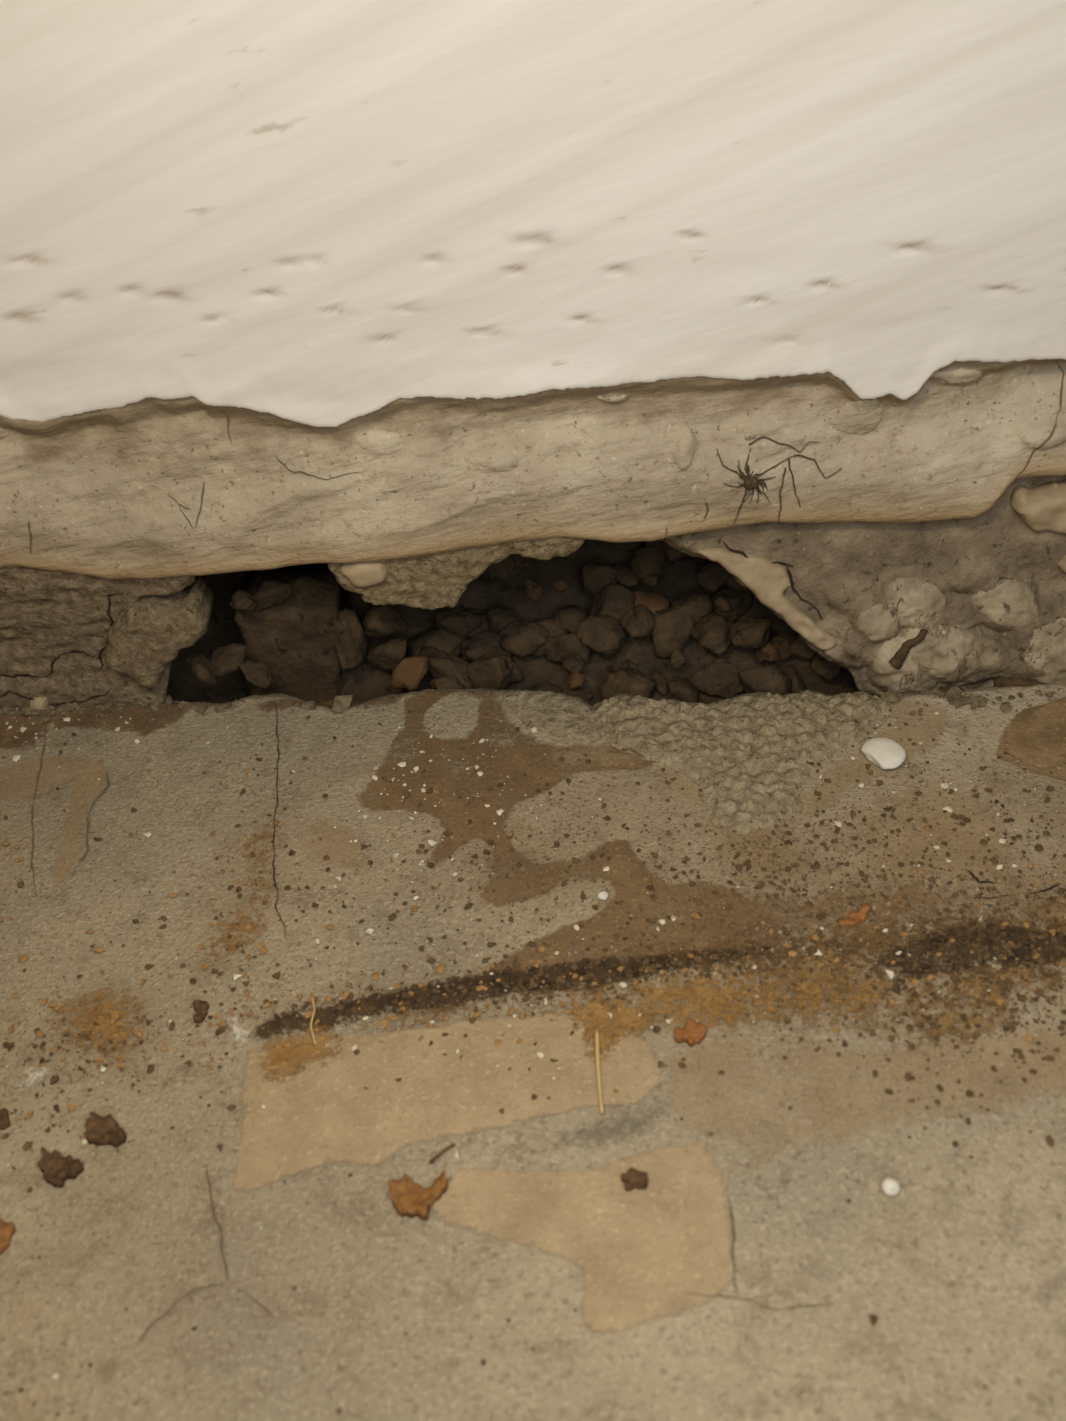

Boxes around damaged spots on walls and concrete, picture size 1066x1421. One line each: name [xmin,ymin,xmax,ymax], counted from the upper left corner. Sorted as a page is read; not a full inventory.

peeling [0,359,1066,711]
crack [272,702,287,941]
leakage [259,690,1064,992]